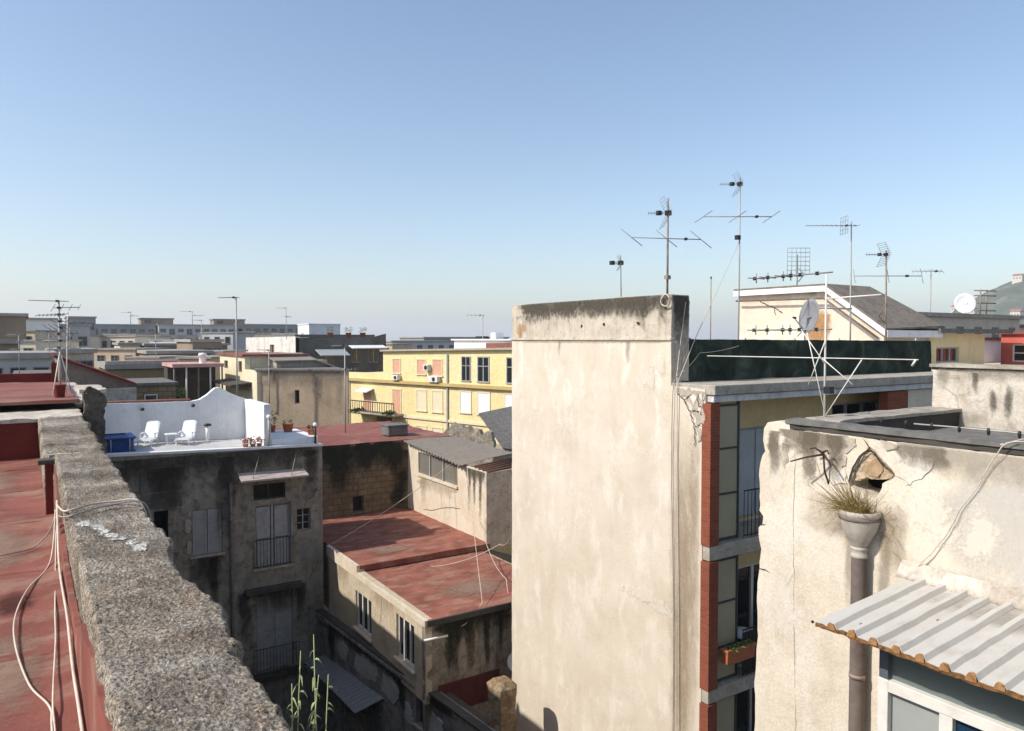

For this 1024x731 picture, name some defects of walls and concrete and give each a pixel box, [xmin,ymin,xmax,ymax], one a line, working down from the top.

water stain [521,295,690,340]
spalling [676,388,705,442]
water stain [989,389,1011,412]
water stain [112,441,408,513]
spalling [808,435,934,498]
crack [759,434,845,625]